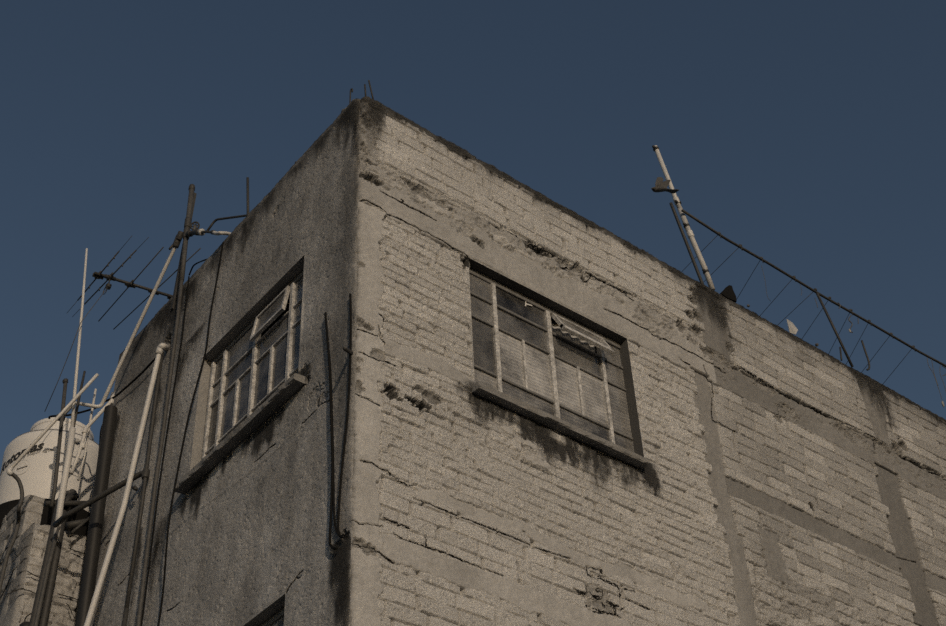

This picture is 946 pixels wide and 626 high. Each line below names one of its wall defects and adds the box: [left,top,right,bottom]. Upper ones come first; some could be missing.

peeling [359,129,463,222]
peeling [469,231,597,292]
leakage [668,265,730,334]
leakage [243,406,284,454]
spalling [380,383,441,415]
leakage [460,382,660,495]
leakage [810,344,913,427]
leakage [181,472,210,514]
leakage [329,536,351,626]